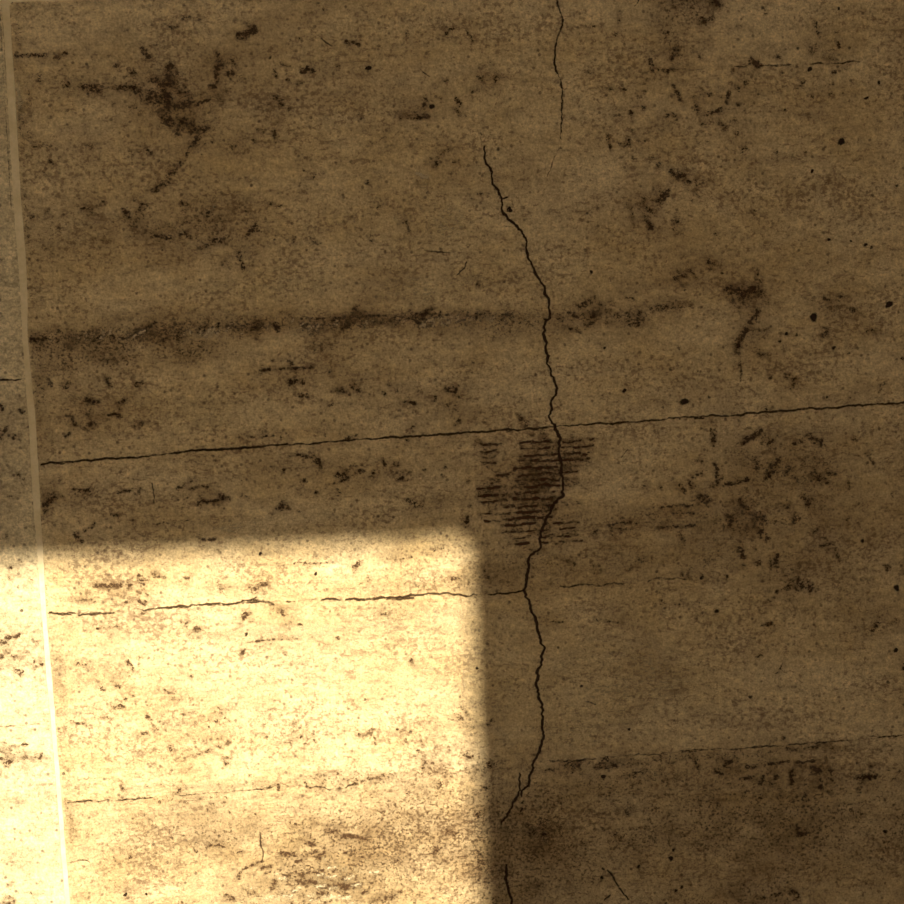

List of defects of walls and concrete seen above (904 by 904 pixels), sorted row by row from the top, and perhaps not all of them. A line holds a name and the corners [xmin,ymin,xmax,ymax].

crack [547,0,564,176]
crack [480,132,565,825]
water stain [461,414,850,568]
water stain [735,546,815,604]